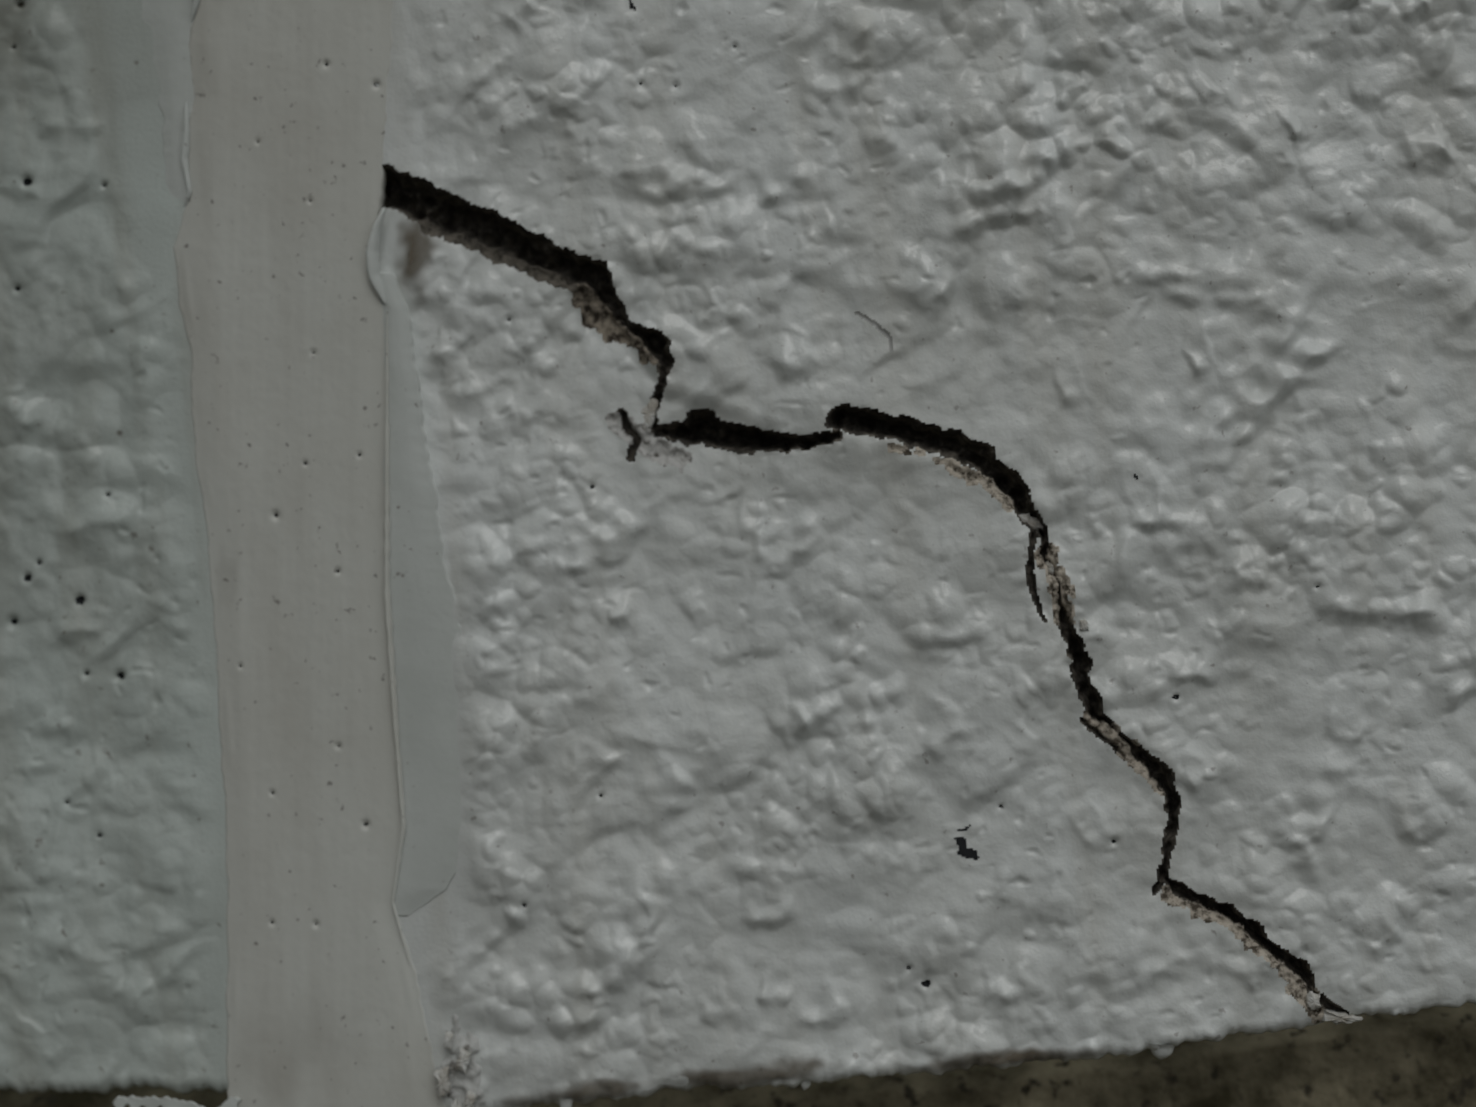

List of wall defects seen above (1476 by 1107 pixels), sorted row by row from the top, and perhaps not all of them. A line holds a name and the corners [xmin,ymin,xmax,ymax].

crack [382,164,1363,1025]